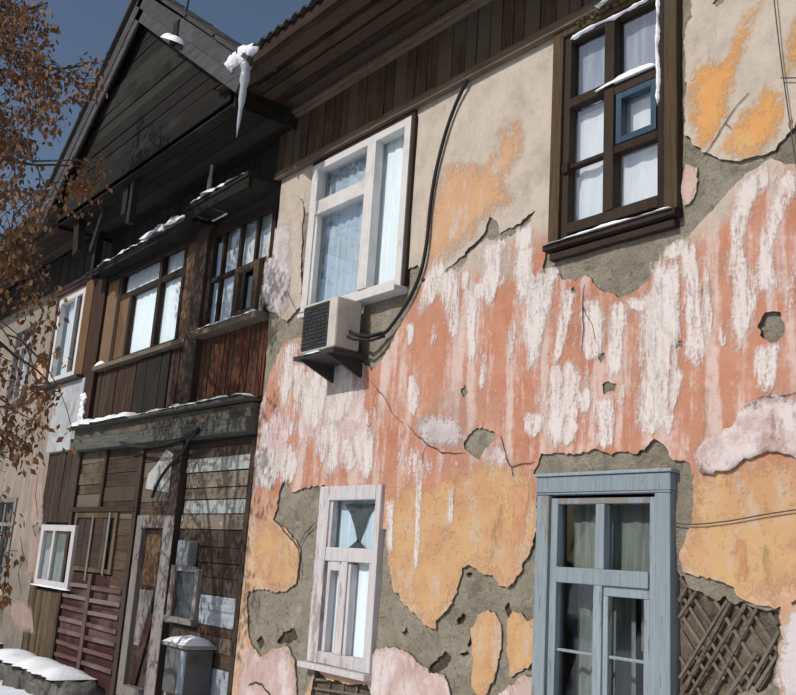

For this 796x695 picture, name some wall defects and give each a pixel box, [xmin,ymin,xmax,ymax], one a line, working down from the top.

flaking render [237,479,325,695]
crack [367,377,458,464]
peeling [356,121,535,371]
crack [500,436,535,475]
peeling [333,427,796,695]
flaking render [541,0,796,298]
flaking render [758,311,785,344]